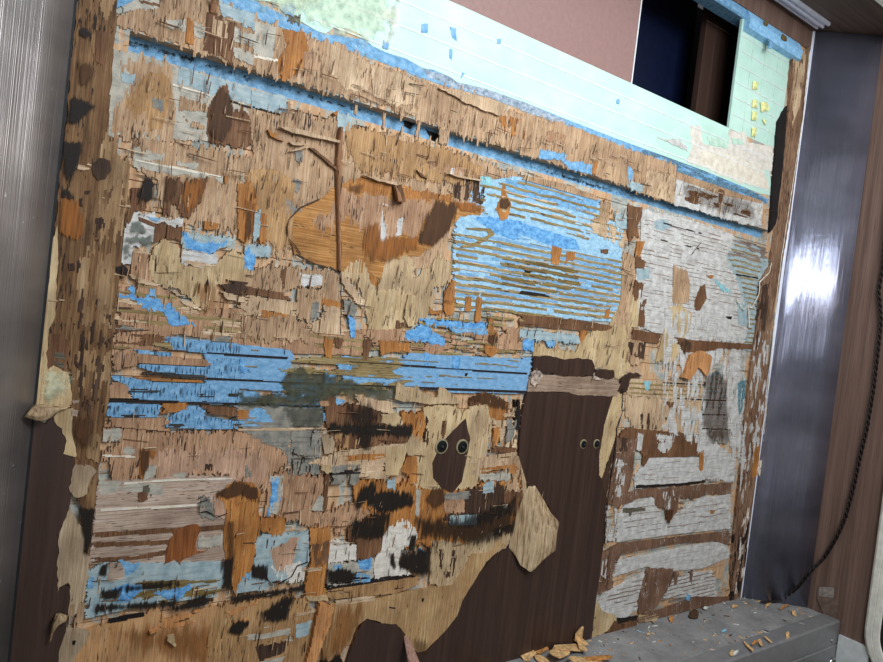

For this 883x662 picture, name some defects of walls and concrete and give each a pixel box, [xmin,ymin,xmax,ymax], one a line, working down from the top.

peeling [185,0,235,66]
peeling [277,29,317,80]
peeling [328,43,422,108]
peeling [118,205,183,282]
peeling [244,168,295,252]
peeling [313,121,482,240]
peeling [241,268,341,347]
peeling [365,272,416,332]
peeling [517,125,774,634]
peeling [69,443,270,571]
peeling [508,486,559,572]
peeling [404,635,419,662]